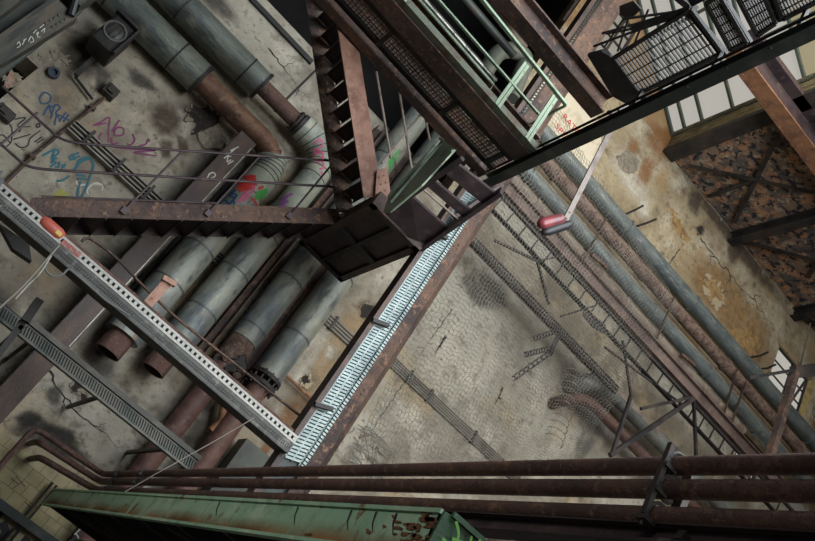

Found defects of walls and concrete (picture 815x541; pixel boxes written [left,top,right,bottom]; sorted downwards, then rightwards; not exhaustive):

peeling [613,147,640,175]
peeling [703,273,725,311]
crack [697,233,778,334]
crack [49,370,118,448]
rust [303,510,352,541]
rust [366,511,437,541]